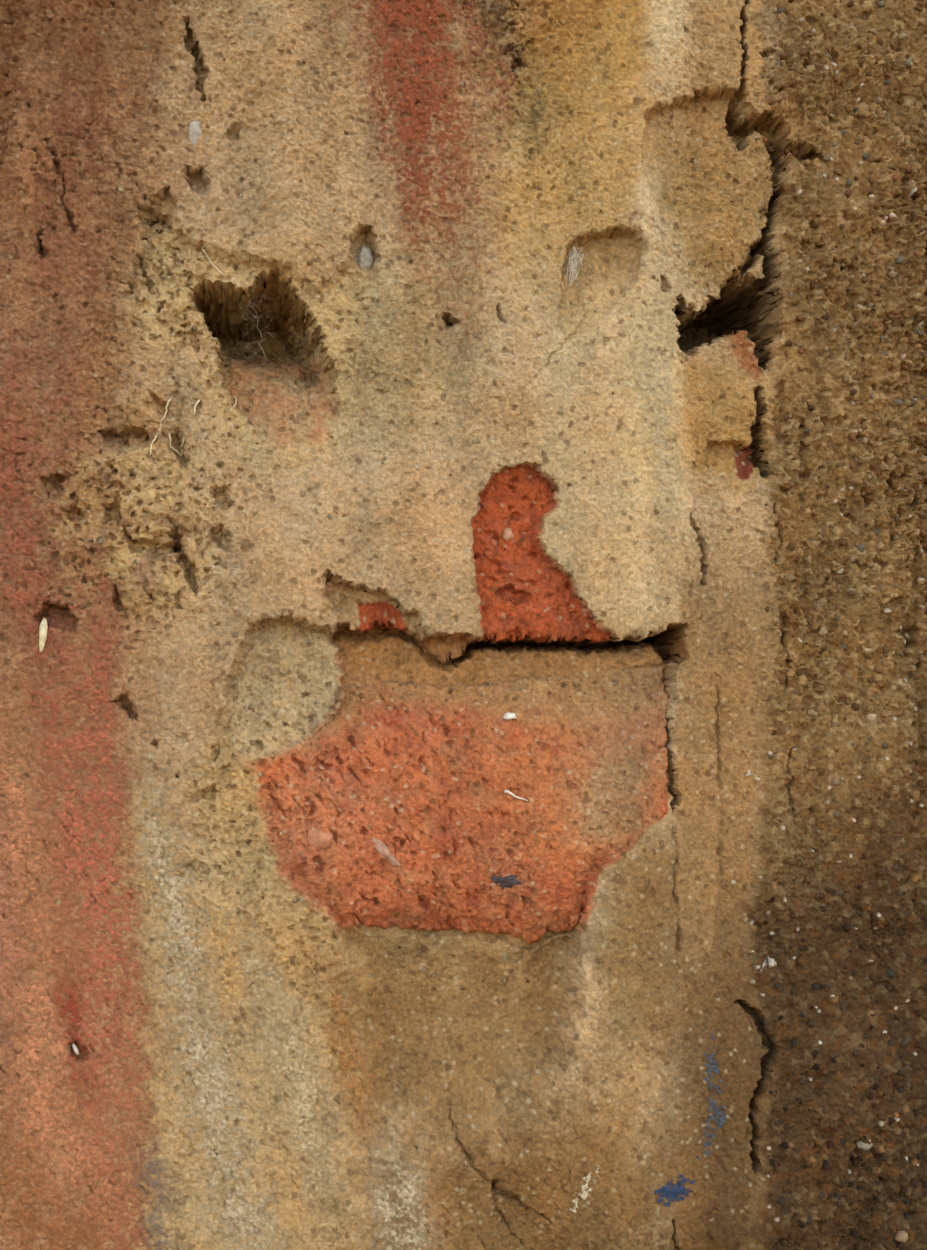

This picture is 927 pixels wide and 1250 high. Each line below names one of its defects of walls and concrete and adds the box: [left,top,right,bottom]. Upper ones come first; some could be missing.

crack [707,0,824,329]
spalling [188,268,344,455]
crack [746,387,784,567]
spalling [210,459,691,800]
spalling [491,875,522,890]
crack [662,661,684,955]
crack [734,999,782,1174]